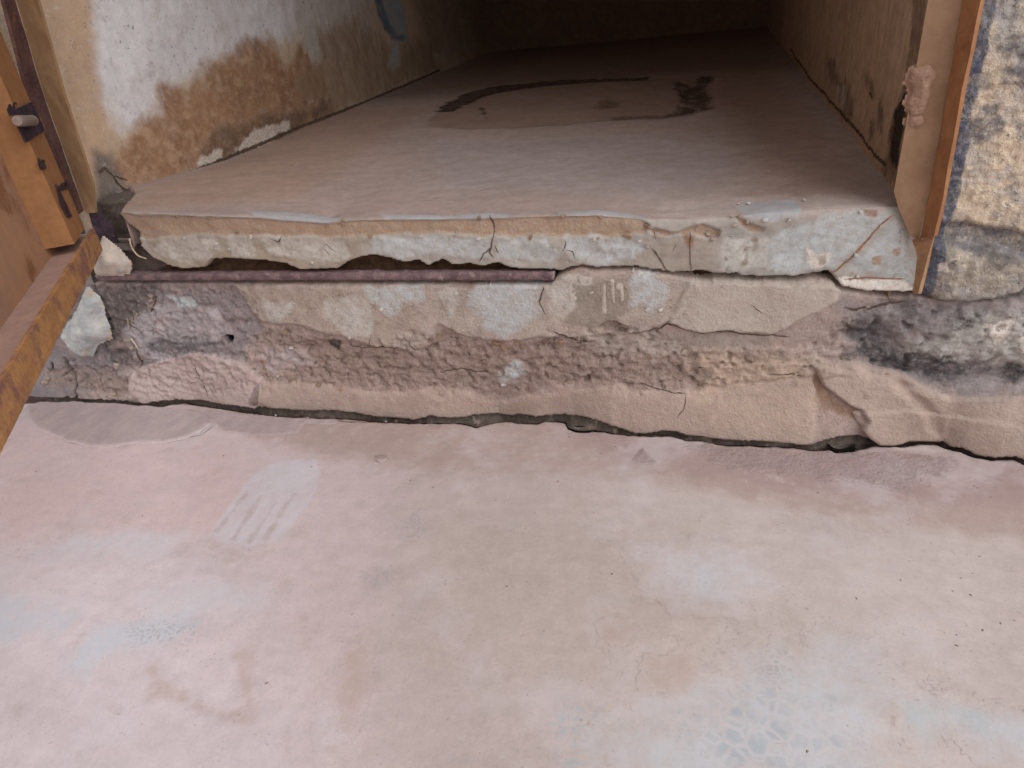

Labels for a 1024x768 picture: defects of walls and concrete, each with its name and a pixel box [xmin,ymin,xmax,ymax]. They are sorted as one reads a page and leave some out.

damp [110,10,442,189]
crack [165,215,589,343]
crack [350,339,419,351]
spalling [113,198,917,398]
crack [652,234,737,275]
crack [820,216,906,330]
damp [833,247,1024,395]
crack [48,366,1024,465]